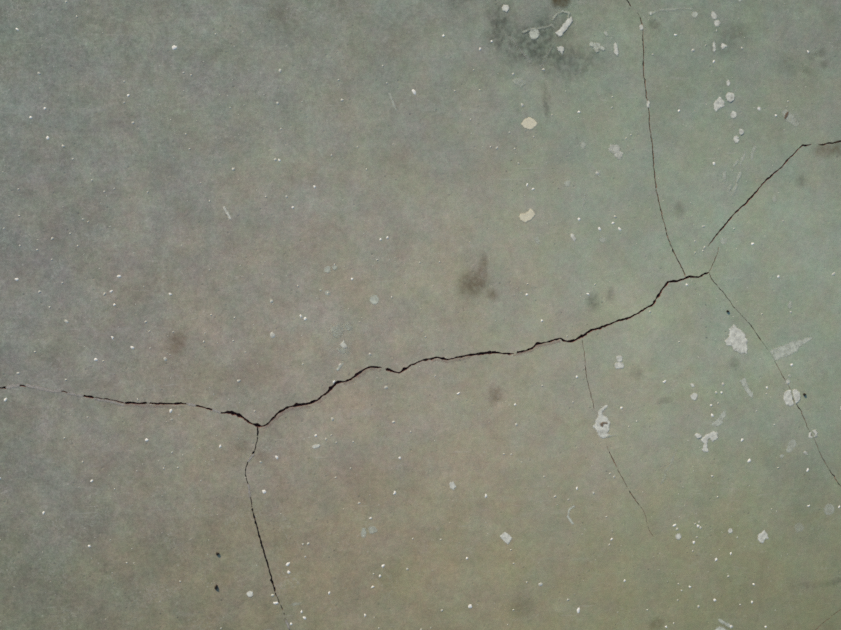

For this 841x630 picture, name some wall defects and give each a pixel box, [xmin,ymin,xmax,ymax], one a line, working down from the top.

crack [641,35,649,101]
crack [708,140,841,246]
crack [0,108,737,630]
crack [775,362,841,486]